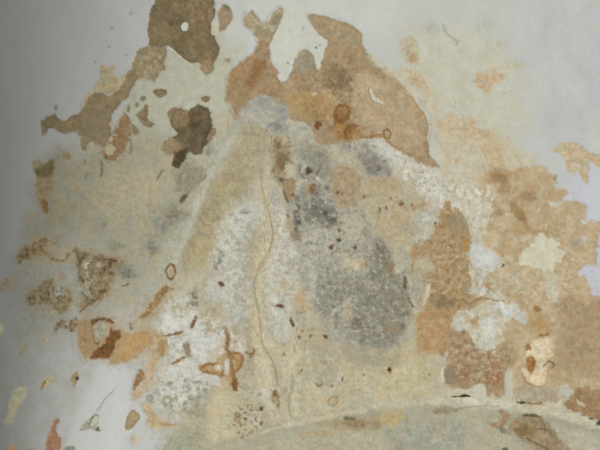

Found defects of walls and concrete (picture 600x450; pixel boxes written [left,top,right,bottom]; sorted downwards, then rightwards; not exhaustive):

corrosion [0,228,201,431]
peeling [40,0,234,182]
corrosion [193,325,289,442]
crack [233,167,295,435]
damp [48,65,600,450]
peeling [224,5,440,168]
peeling [406,163,600,450]
peeling [550,141,600,185]